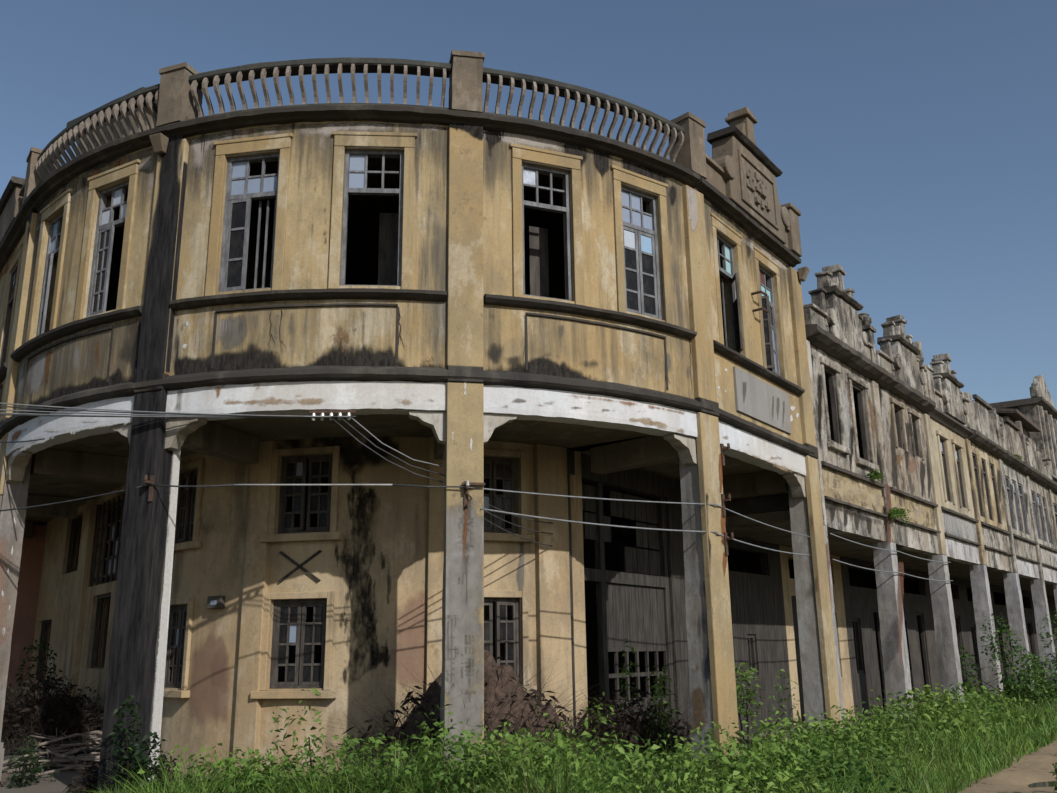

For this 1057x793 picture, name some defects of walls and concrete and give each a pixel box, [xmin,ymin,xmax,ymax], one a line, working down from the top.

water stain [527,143,681,228]
water stain [488,345,595,380]
water stain [0,108,512,793]
peeling [630,418,666,428]